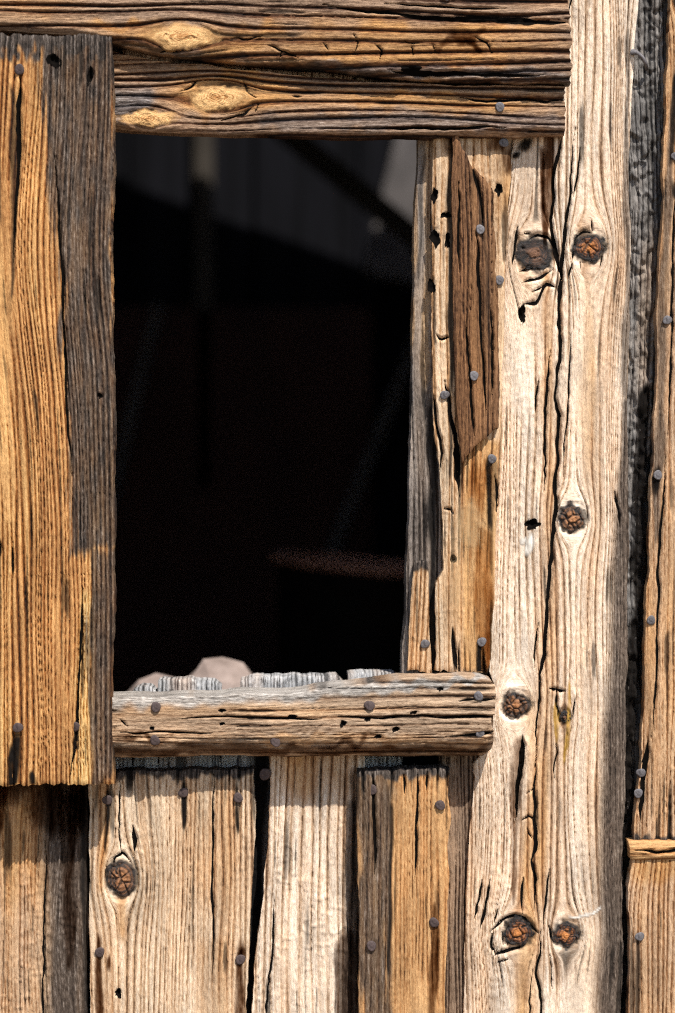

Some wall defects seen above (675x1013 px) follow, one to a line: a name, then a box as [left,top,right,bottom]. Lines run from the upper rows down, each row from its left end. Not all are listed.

crack [236,36,296,57]
crack [323,0,572,130]
crack [433,169,493,512]
crack [474,127,605,1013]
crack [450,630,458,668]
crack [265,900,275,1013]